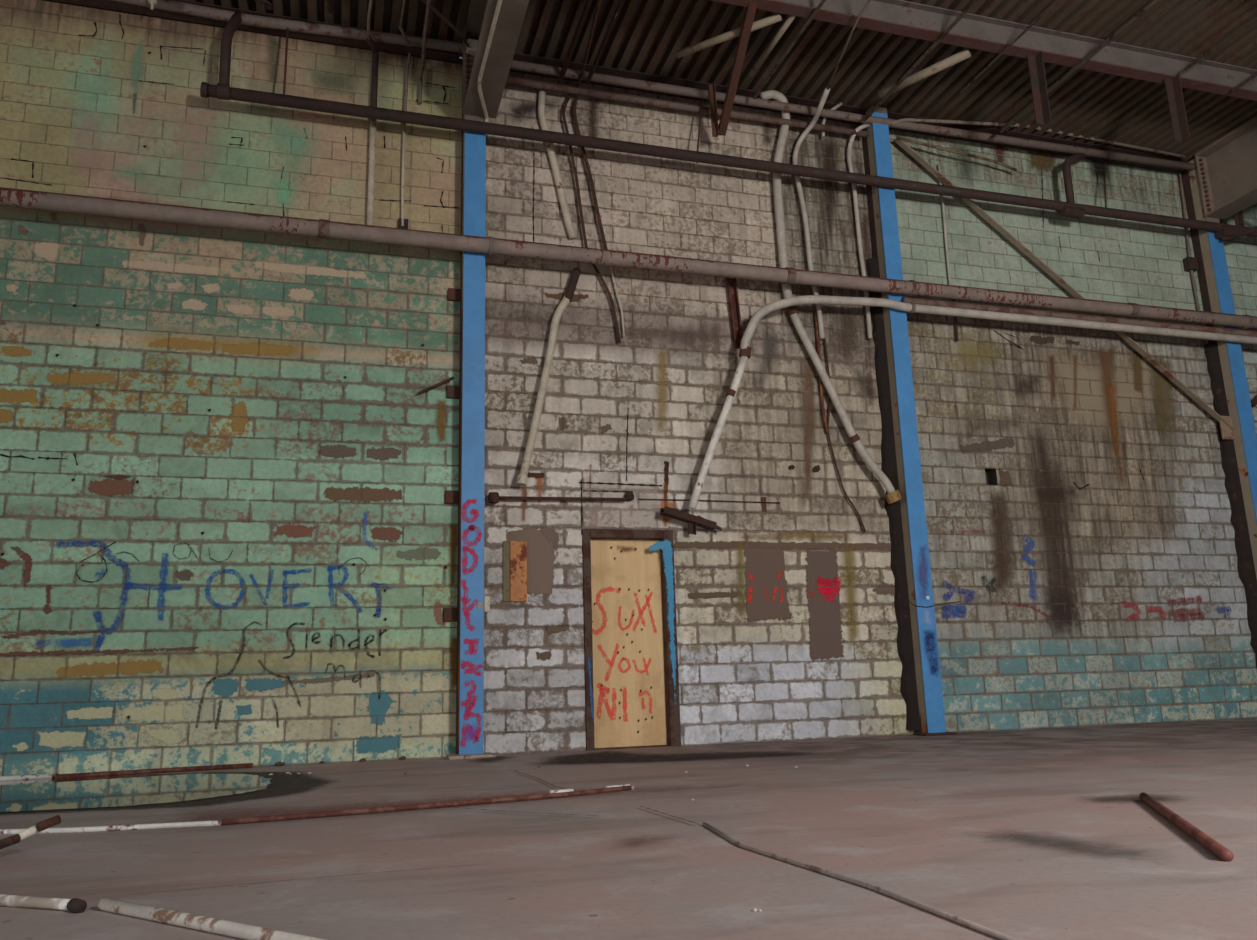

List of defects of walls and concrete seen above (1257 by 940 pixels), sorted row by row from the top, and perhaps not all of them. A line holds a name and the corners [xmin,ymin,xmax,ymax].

peeling [122,224,367,318]
corrosion [1133,352,1142,391]
corrosion [1101,353,1122,480]
spalling [88,475,135,497]
spalling [323,486,403,503]
spalling [0,546,32,590]
damp [993,496,1010,586]
damp [1036,439,1073,624]
peeling [0,629,198,679]
peeling [12,688,185,752]
peeling [212,673,375,715]
peeling [356,690,402,754]